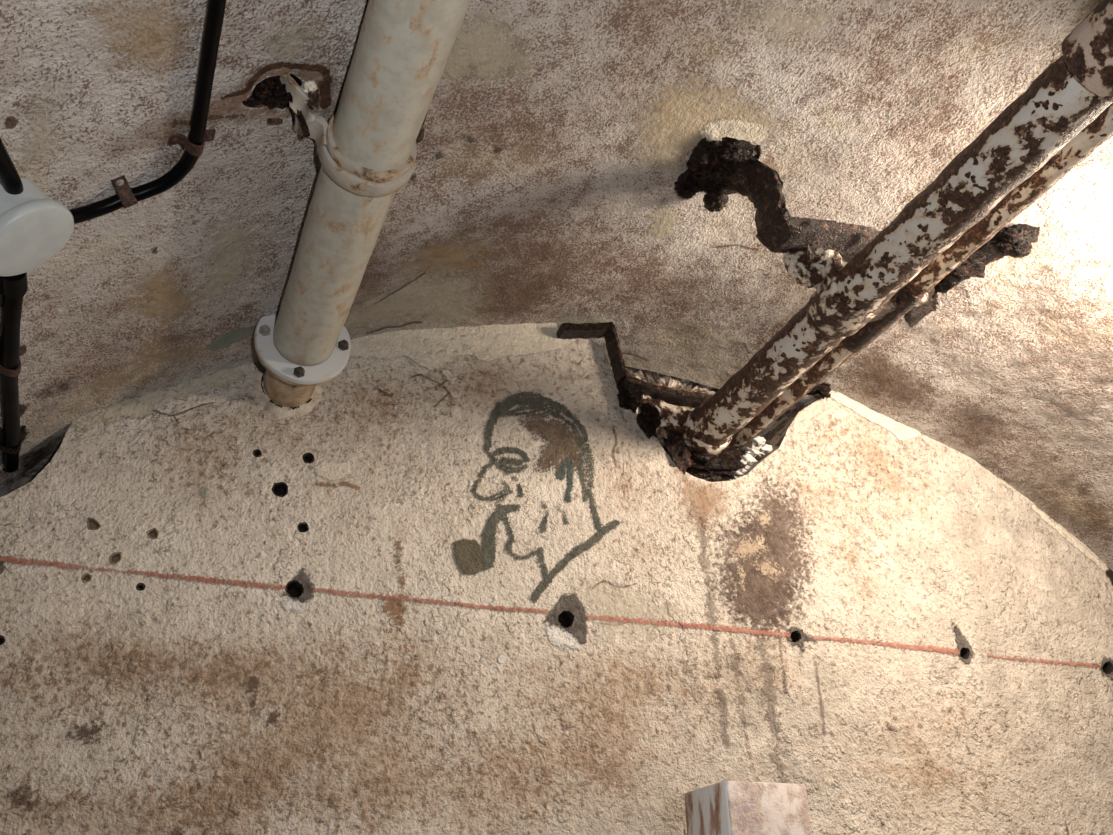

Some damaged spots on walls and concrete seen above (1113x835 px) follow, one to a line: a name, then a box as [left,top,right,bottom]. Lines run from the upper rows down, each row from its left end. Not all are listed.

spalling [242,76,290,109]
water stain [705,473,817,694]
water stain [816,667,825,735]